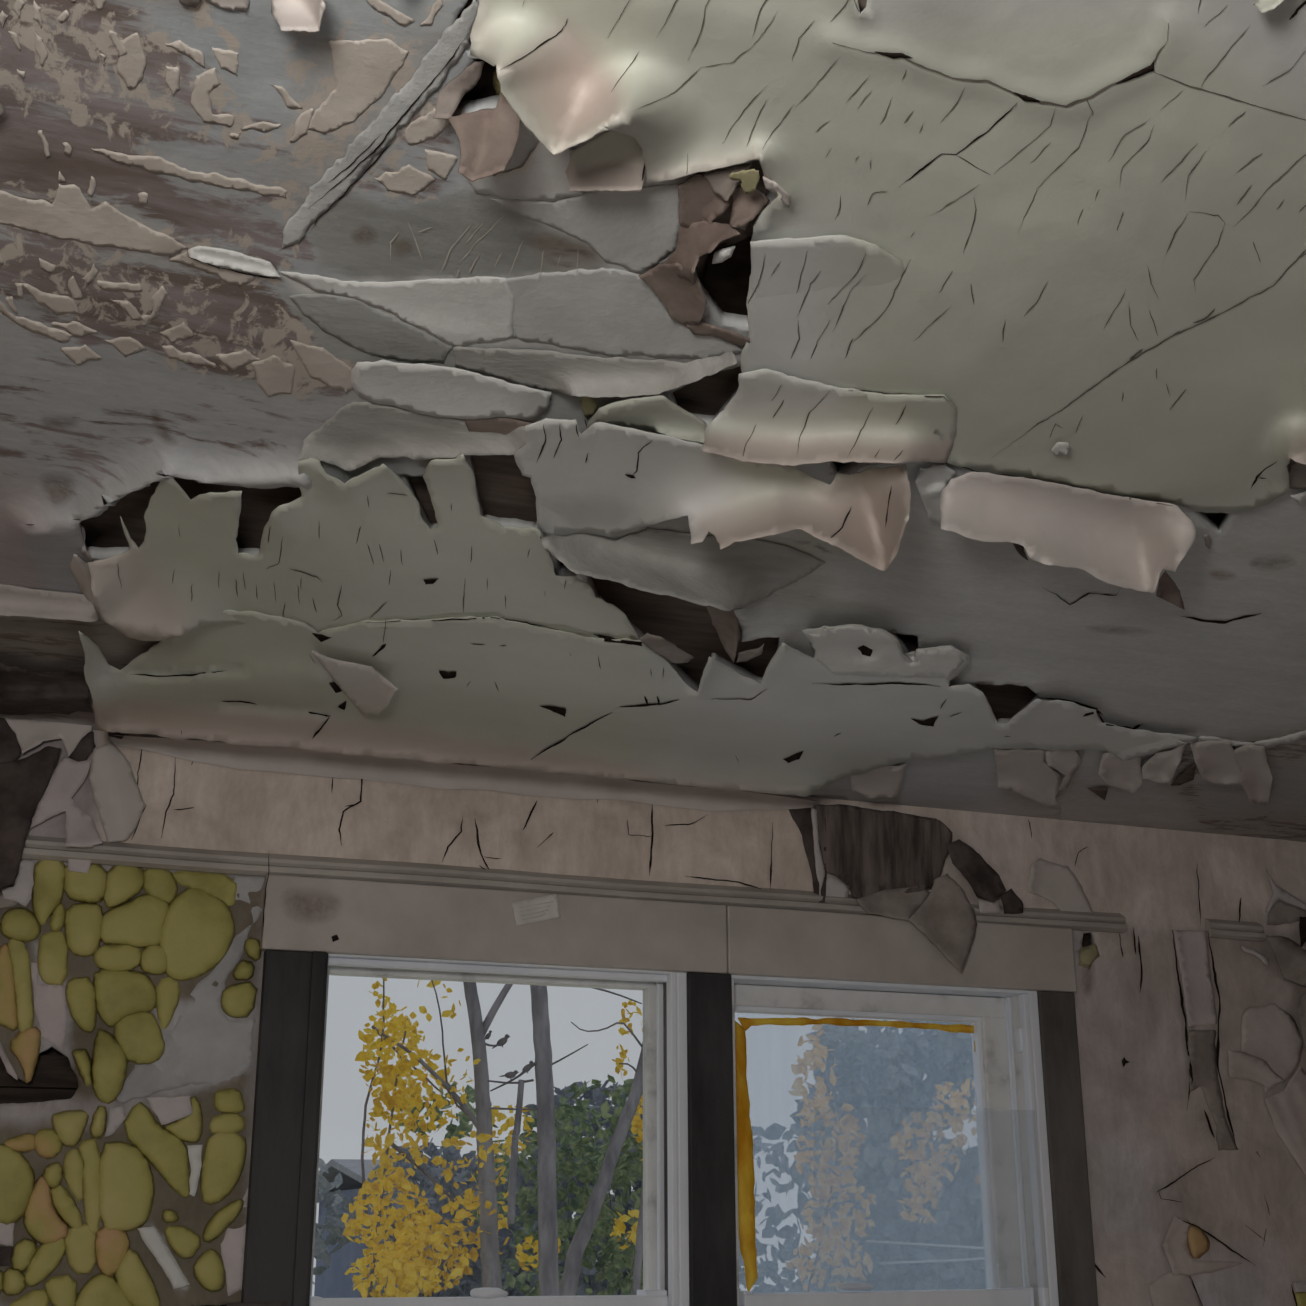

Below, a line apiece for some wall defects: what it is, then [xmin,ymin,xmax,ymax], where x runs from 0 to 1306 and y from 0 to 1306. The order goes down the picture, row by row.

crack [499,19,568,71]
crack [611,0,1306,528]
crack [536,420,588,463]
peeling [0,0,1306,843]
crack [172,493,677,759]
crack [830,682,961,717]
crack [442,819,501,869]
crack [627,807,707,875]
crack [687,824,773,889]
peeling [978,899,1001,913]
peeling [0,860,265,1306]
peeling [1240,1003,1306,1176]